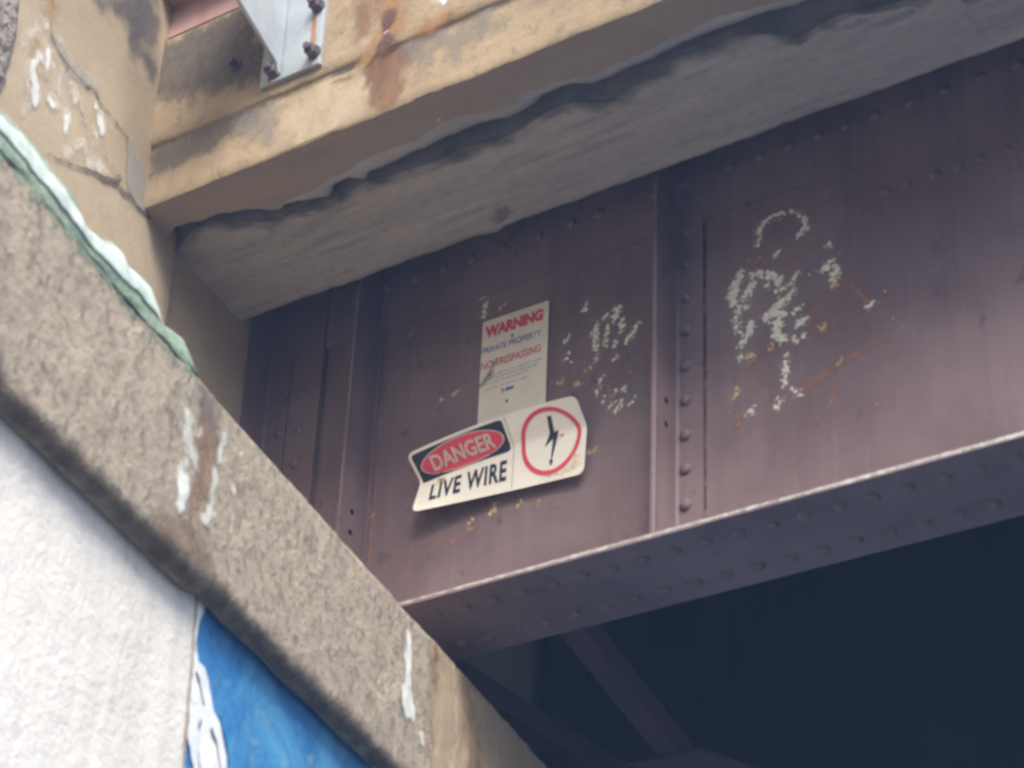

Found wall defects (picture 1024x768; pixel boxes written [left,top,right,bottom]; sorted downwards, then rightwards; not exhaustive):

crack [52,34,129,140]
corrosion [368,0,406,109]
spalling [172,0,906,251]
crack [55,157,151,219]